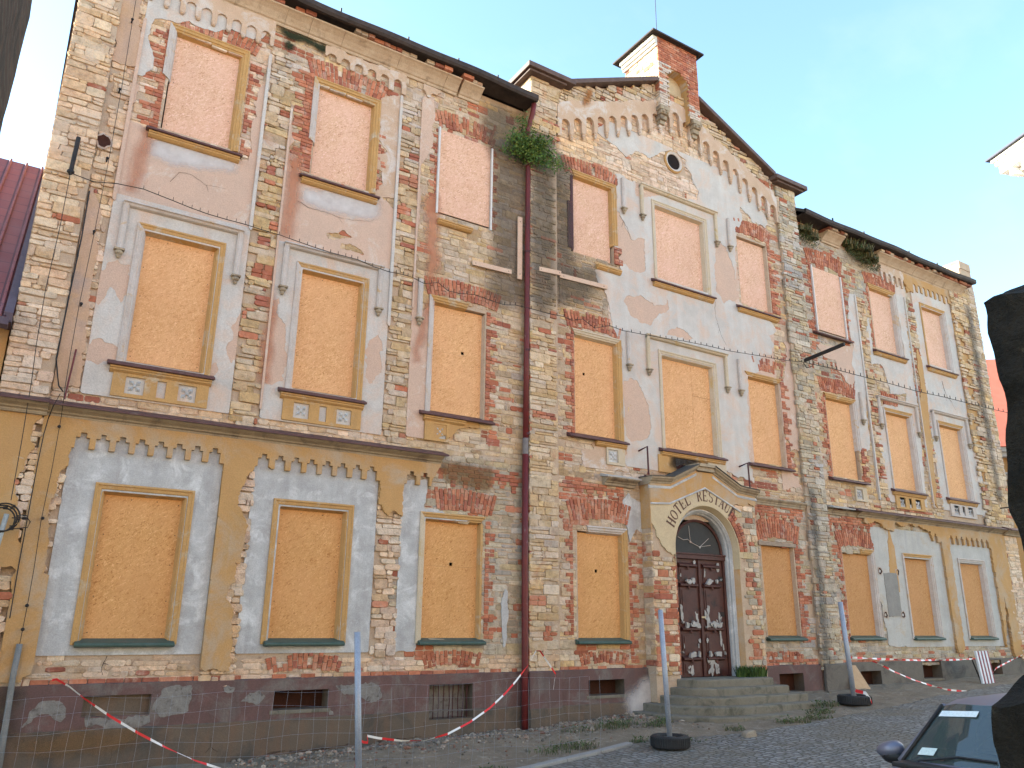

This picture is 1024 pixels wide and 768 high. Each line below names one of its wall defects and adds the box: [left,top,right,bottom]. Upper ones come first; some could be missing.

flaking render [0,0,738,729]
damp [487,112,522,298]
damp [537,137,593,310]
flaking render [700,114,1024,670]